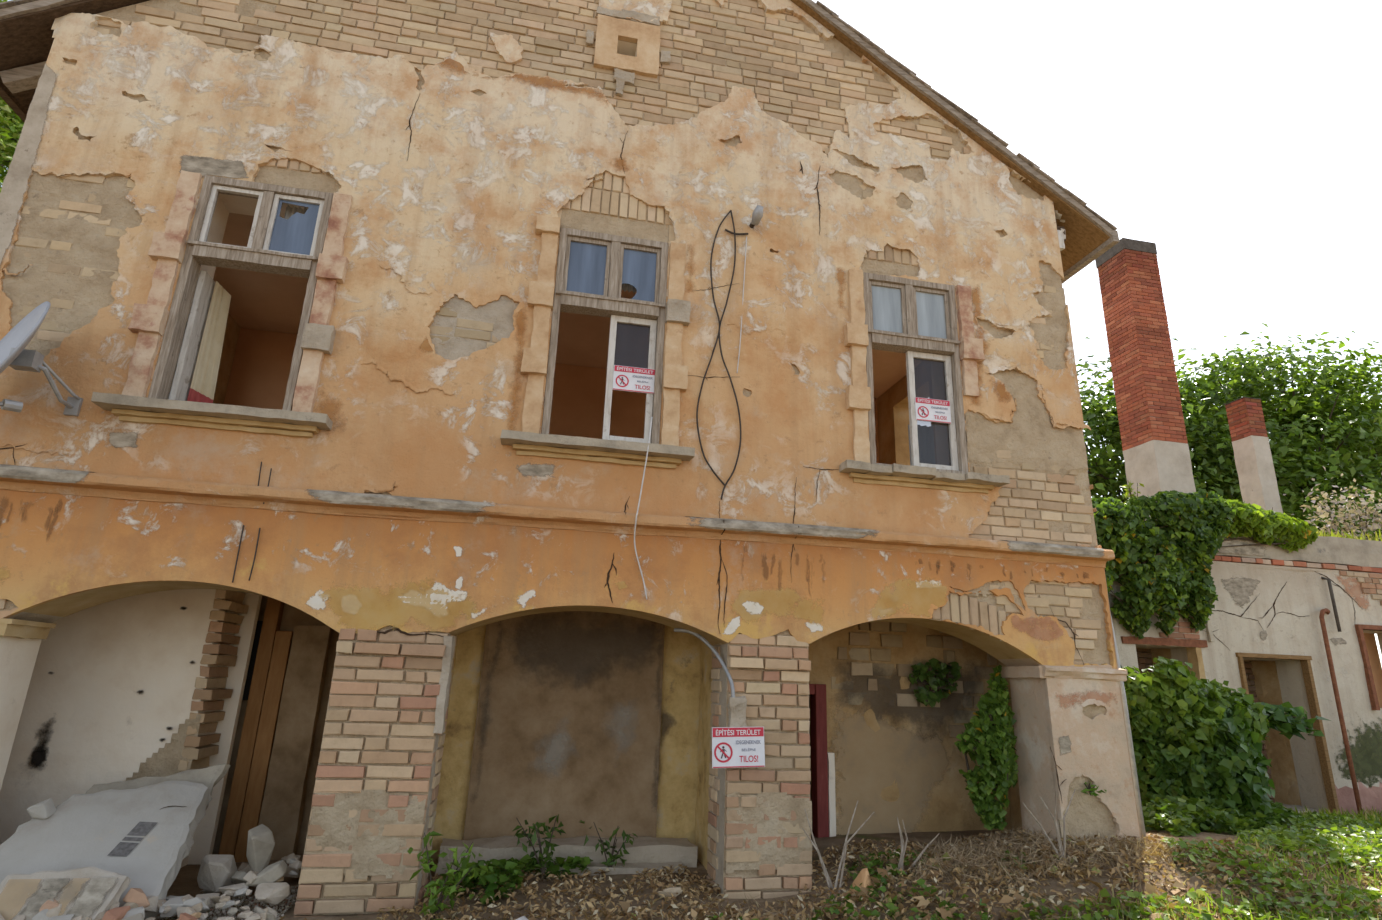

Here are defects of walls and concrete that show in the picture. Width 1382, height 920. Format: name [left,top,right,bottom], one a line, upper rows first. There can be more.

spalling [94,0,971,210]
spalling [556,171,675,242]
spalling [2,170,146,356]
spalling [860,242,918,277]
spalling [379,264,519,360]
spalling [965,262,1097,548]
spalling [0,599,18,609]
crack [1202,571,1358,649]
flaking render [831,580,1112,738]